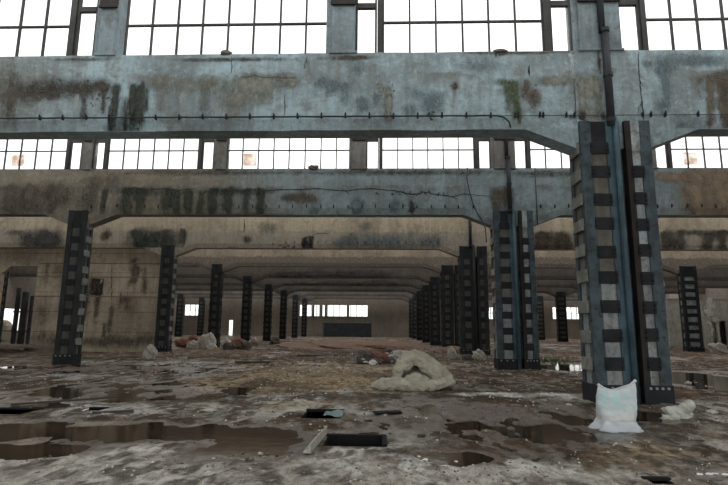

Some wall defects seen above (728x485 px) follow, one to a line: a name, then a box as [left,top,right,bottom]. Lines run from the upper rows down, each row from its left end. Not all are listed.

damp [498,80,521,124]
crack [637,53,645,121]
damp [644,56,720,109]
damp [698,69,728,128]
damp [121,186,265,214]
crack [125,187,490,199]
damp [130,229,186,248]
damp [661,230,728,250]